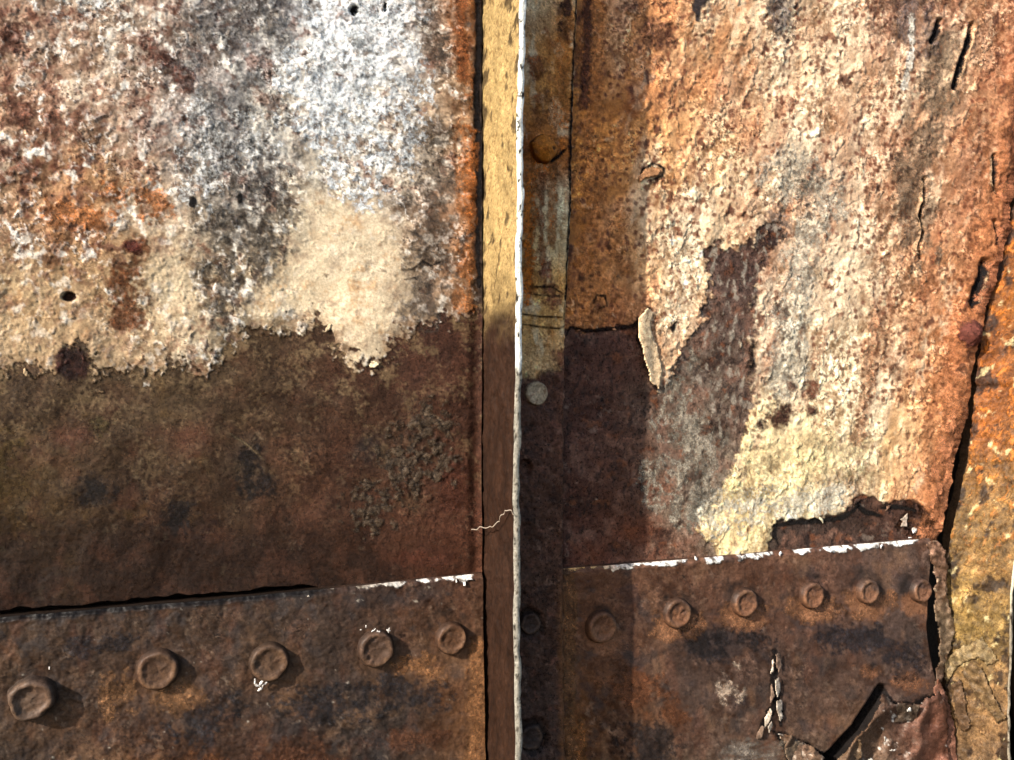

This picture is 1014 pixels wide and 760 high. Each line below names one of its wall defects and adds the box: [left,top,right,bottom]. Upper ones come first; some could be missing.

damp [55,0,123,18]
crack [929,19,941,44]
crack [951,28,975,90]
damp [167,0,458,332]
rust [522,0,636,323]
crack [989,156,997,191]
rust [106,232,153,332]
crack [969,224,999,308]
rust [756,380,820,429]
peeling [519,216,784,760]
peeling [768,494,930,556]
rust [772,540,958,760]